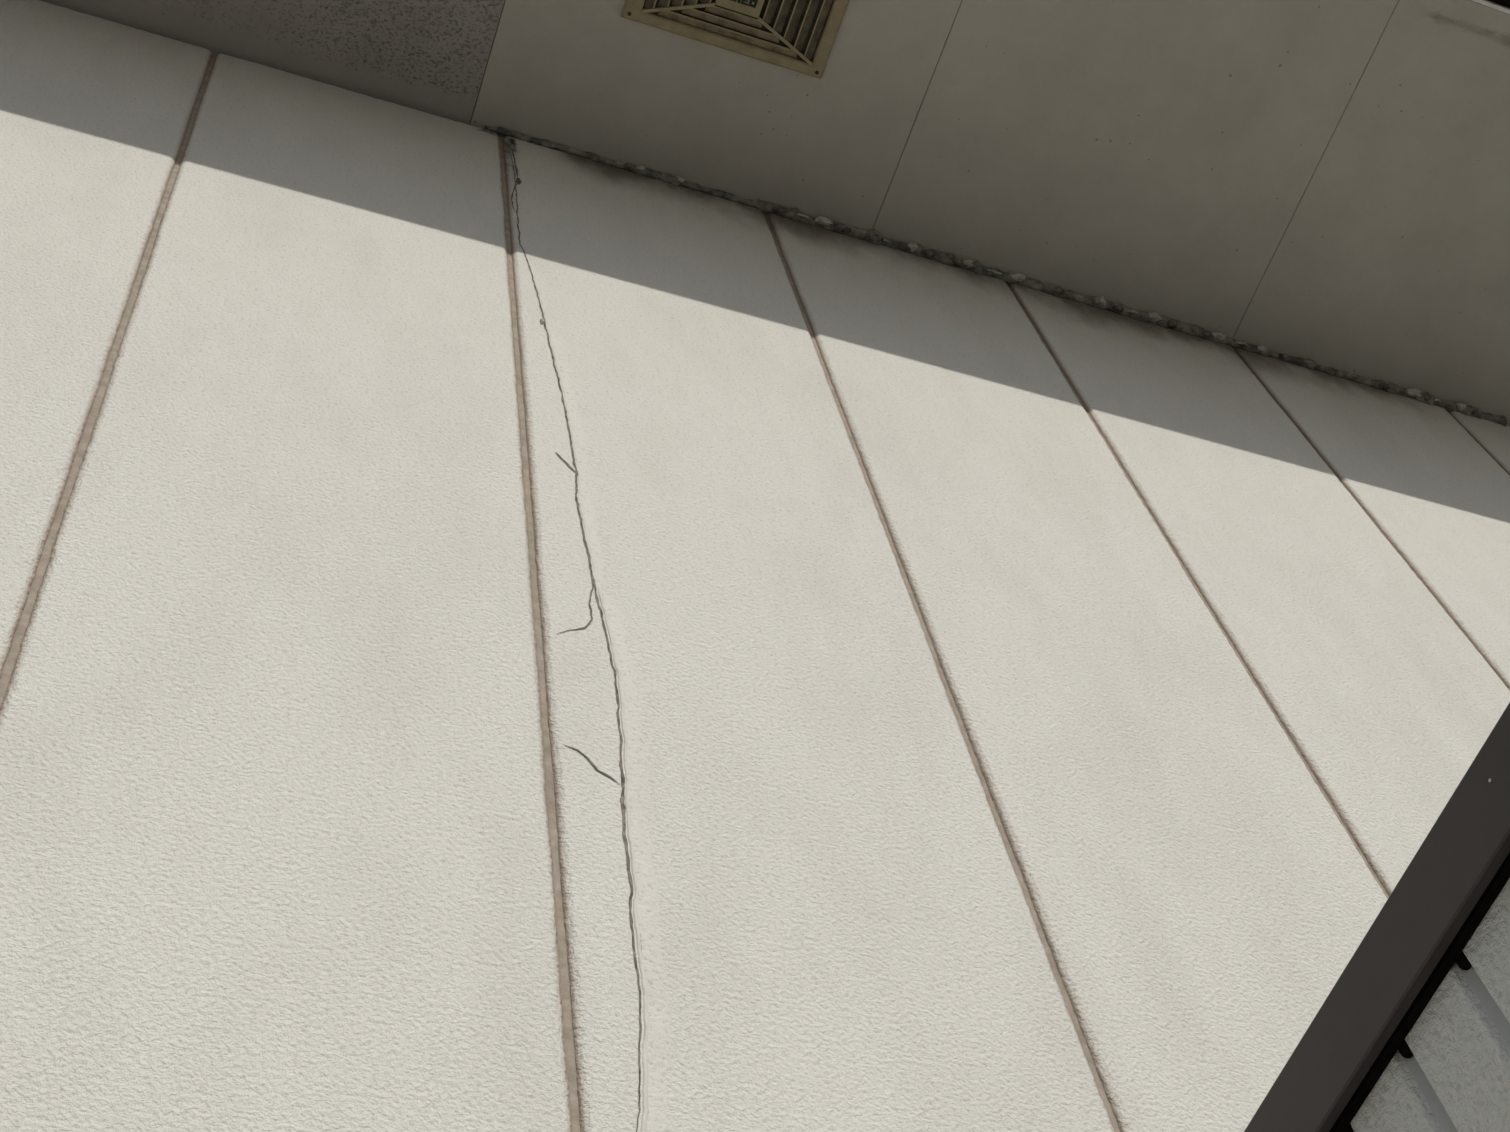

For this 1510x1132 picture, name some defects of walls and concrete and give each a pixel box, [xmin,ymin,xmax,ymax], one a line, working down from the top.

crack [503,139,649,1132]